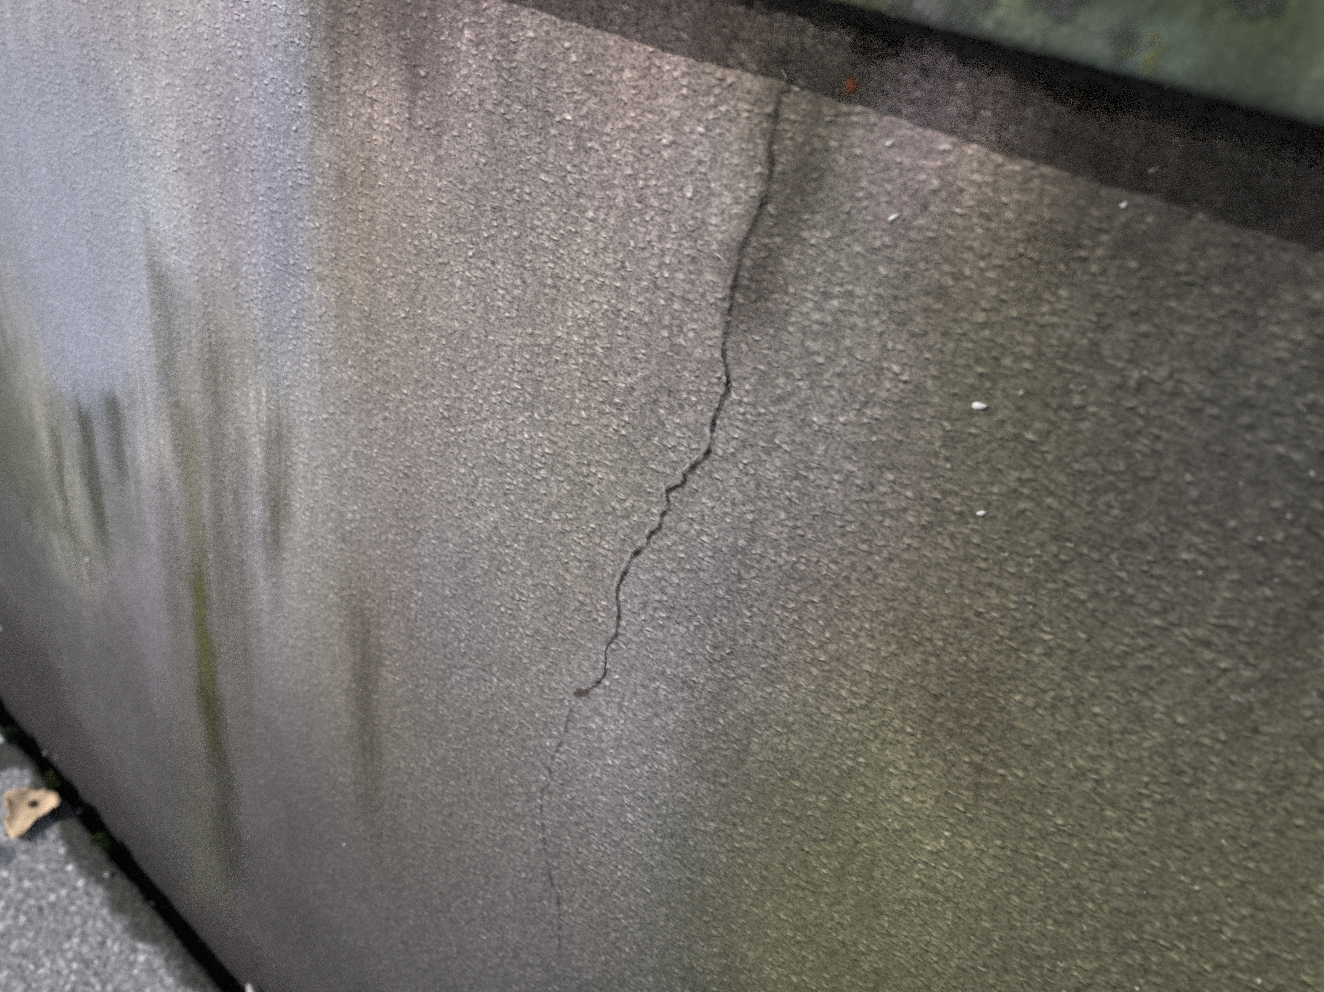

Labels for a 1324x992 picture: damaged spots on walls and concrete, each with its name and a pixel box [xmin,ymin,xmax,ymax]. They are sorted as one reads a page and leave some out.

damp [0,73,153,396]
damp [744,48,875,310]
crack [540,342,730,964]
damp [0,724,222,992]